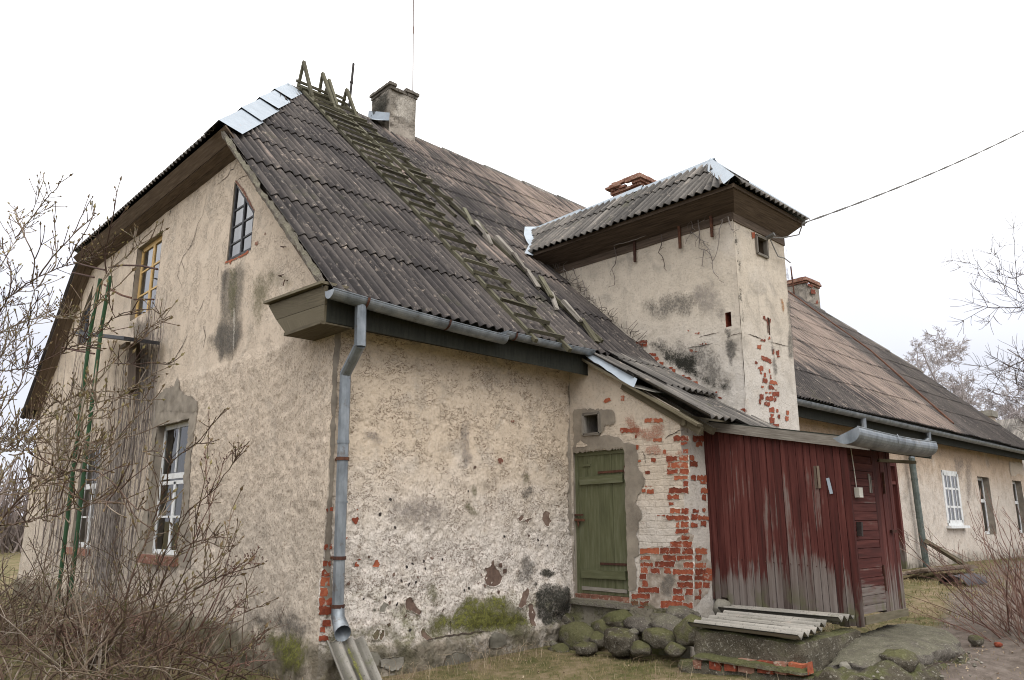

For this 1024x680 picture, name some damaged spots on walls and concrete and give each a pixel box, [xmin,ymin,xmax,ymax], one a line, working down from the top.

damp [215,267,243,356]
damp [650,297,691,314]
damp [654,329,736,389]
spalling [755,316,789,426]
spalling [620,418,712,609]
spalling [317,544,332,641]
spalling [464,558,507,594]
spalling [517,586,537,628]
damp [519,557,572,625]